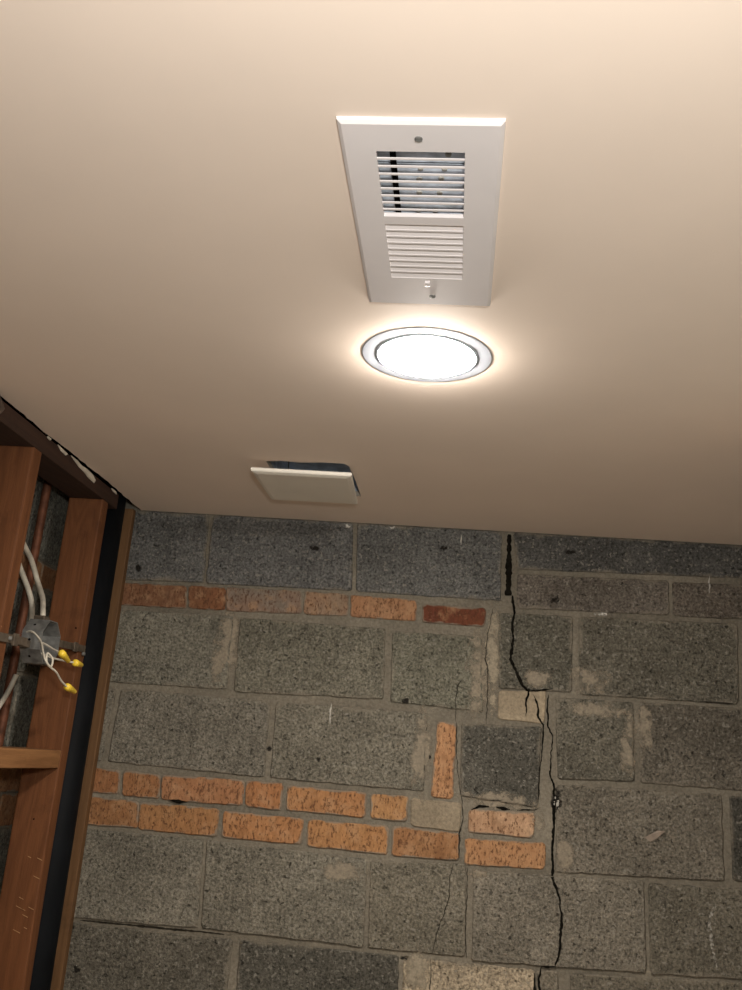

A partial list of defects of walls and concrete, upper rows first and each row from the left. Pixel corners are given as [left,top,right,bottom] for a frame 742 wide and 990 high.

crack [429,680,468,990]
crack [484,595,563,990]